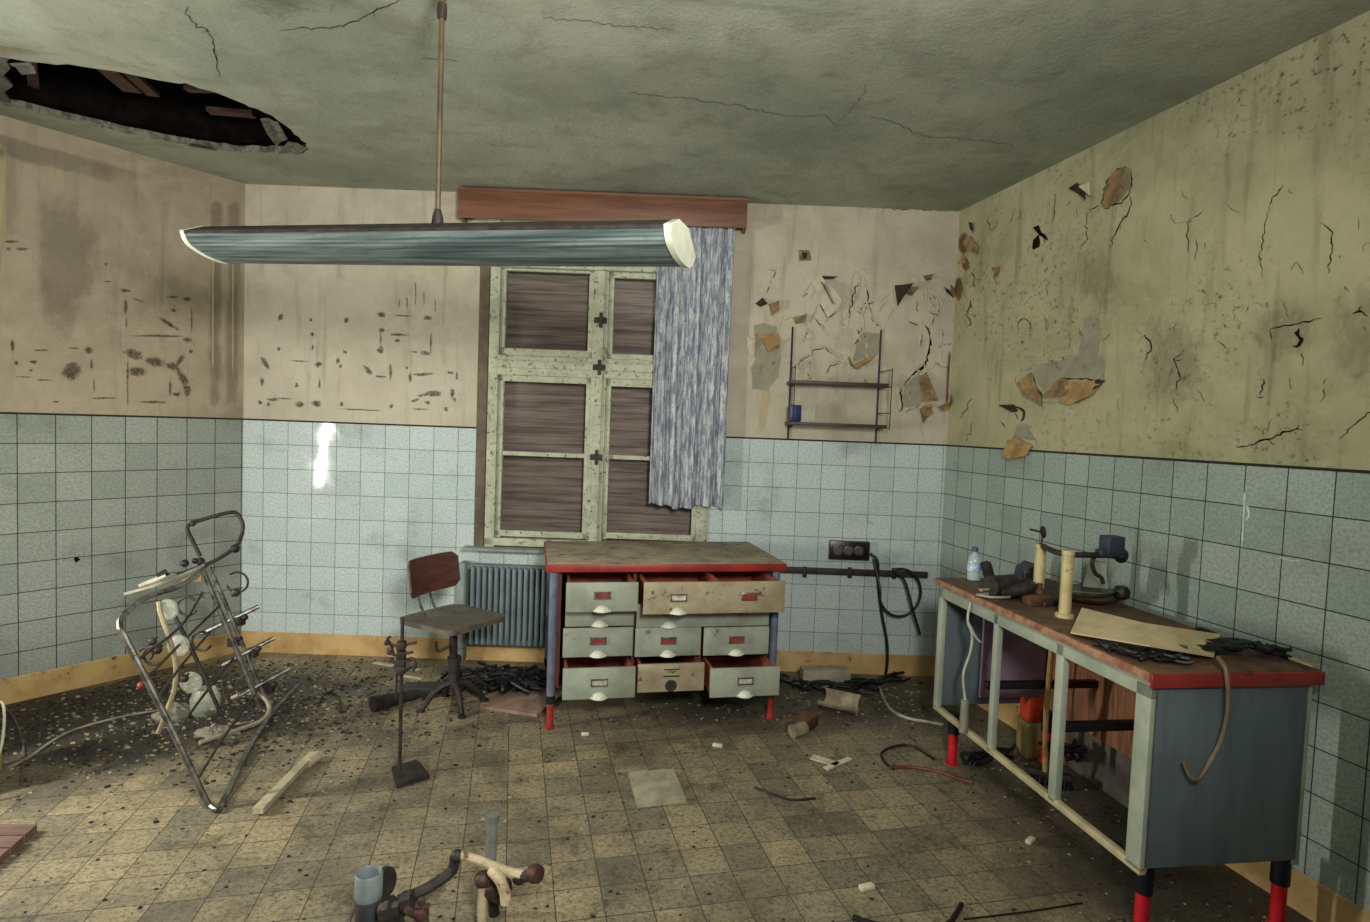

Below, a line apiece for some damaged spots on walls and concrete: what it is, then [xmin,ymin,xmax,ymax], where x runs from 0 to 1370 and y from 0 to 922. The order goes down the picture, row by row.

flaking render [10,62,36,75]
crack [185,9,220,74]
crack [280,0,399,31]
flaking render [0,99,309,154]
peeling [1069,166,1132,210]
peeling [799,250,811,261]
crack [1170,185,1367,448]
peeling [745,266,972,434]
peeling [999,316,1105,460]
crack [1144,328,1205,409]